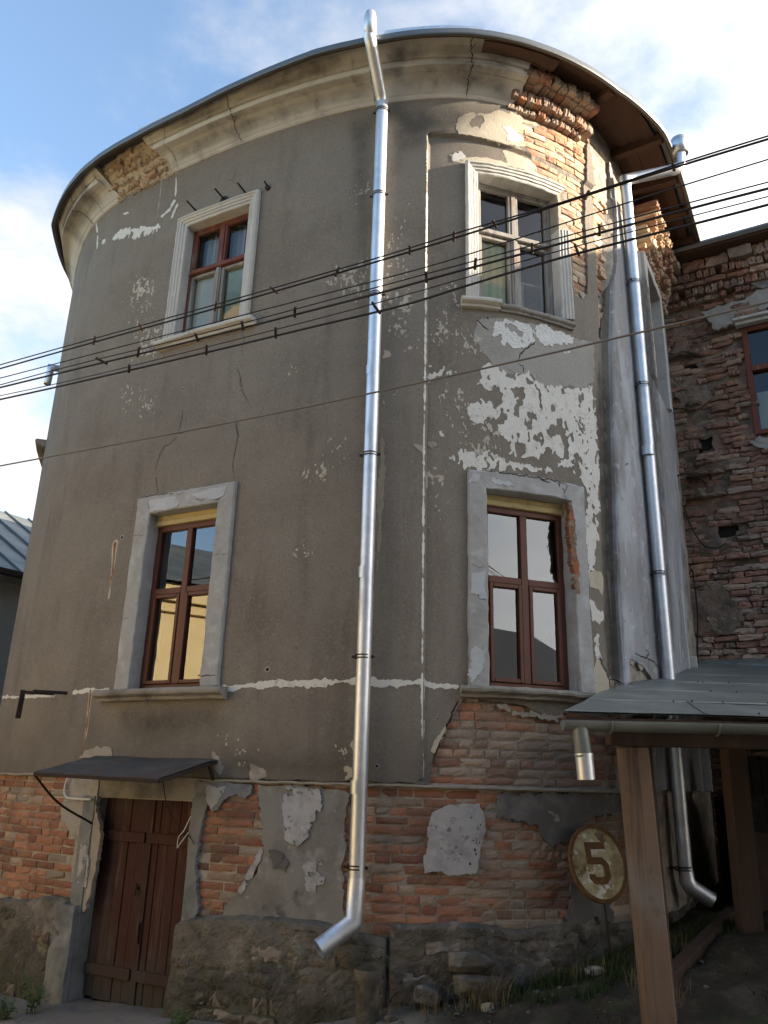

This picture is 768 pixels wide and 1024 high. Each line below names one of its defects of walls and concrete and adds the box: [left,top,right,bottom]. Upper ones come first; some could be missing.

crack [466,38,477,96]
peeling [101,199,178,244]
crack [144,415,220,508]
peeling [371,110,622,788]
peeling [238,786,325,897]